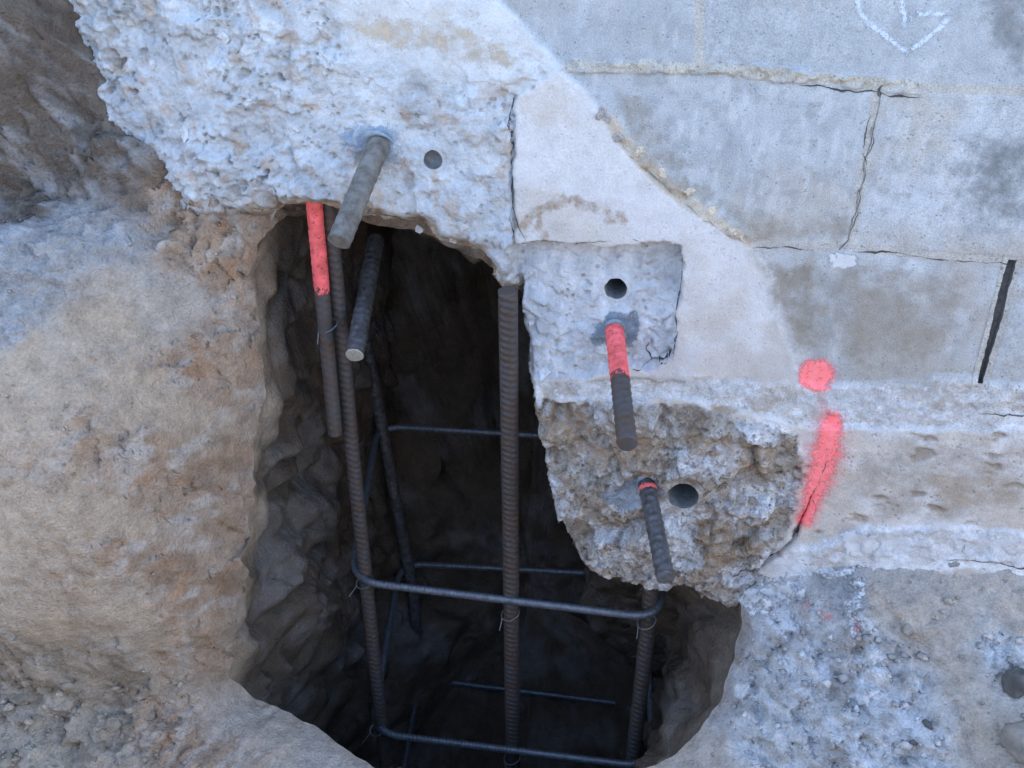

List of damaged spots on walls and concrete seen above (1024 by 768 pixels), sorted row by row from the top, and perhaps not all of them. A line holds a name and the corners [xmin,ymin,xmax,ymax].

crack [507,98,603,244]
crack [752,84,1009,265]
spalling [69,0,807,768]
crack [731,461,827,578]